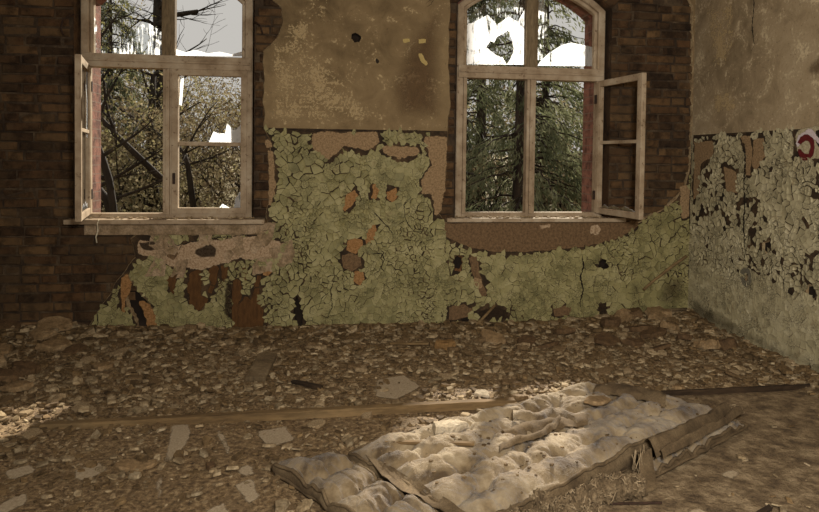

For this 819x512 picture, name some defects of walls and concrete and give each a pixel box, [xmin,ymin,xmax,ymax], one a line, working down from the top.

spalling [0,0,819,373]
crack [579,256,587,307]
peeling [375,375,420,399]